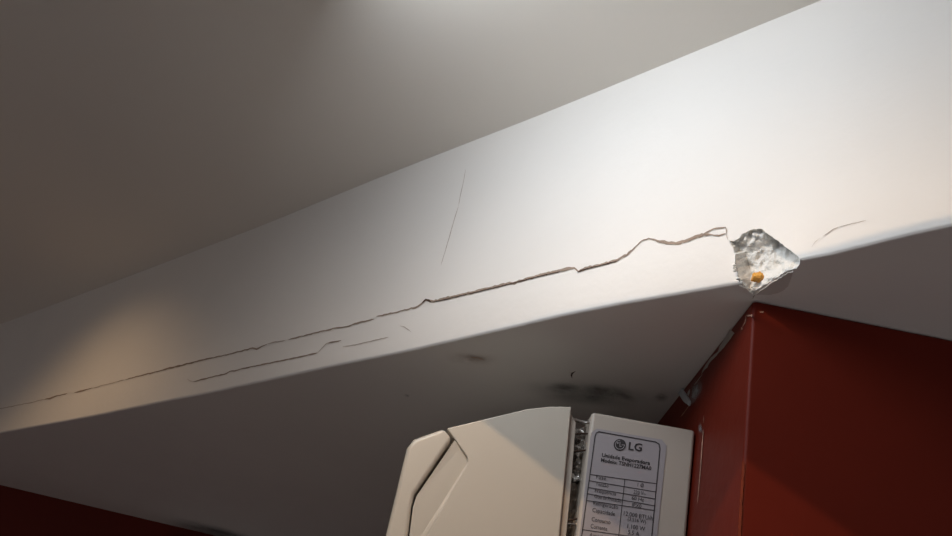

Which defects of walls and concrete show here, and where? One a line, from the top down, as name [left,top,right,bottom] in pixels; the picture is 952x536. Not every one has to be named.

crack [0,227,728,409]
spalling [729,229,800,297]